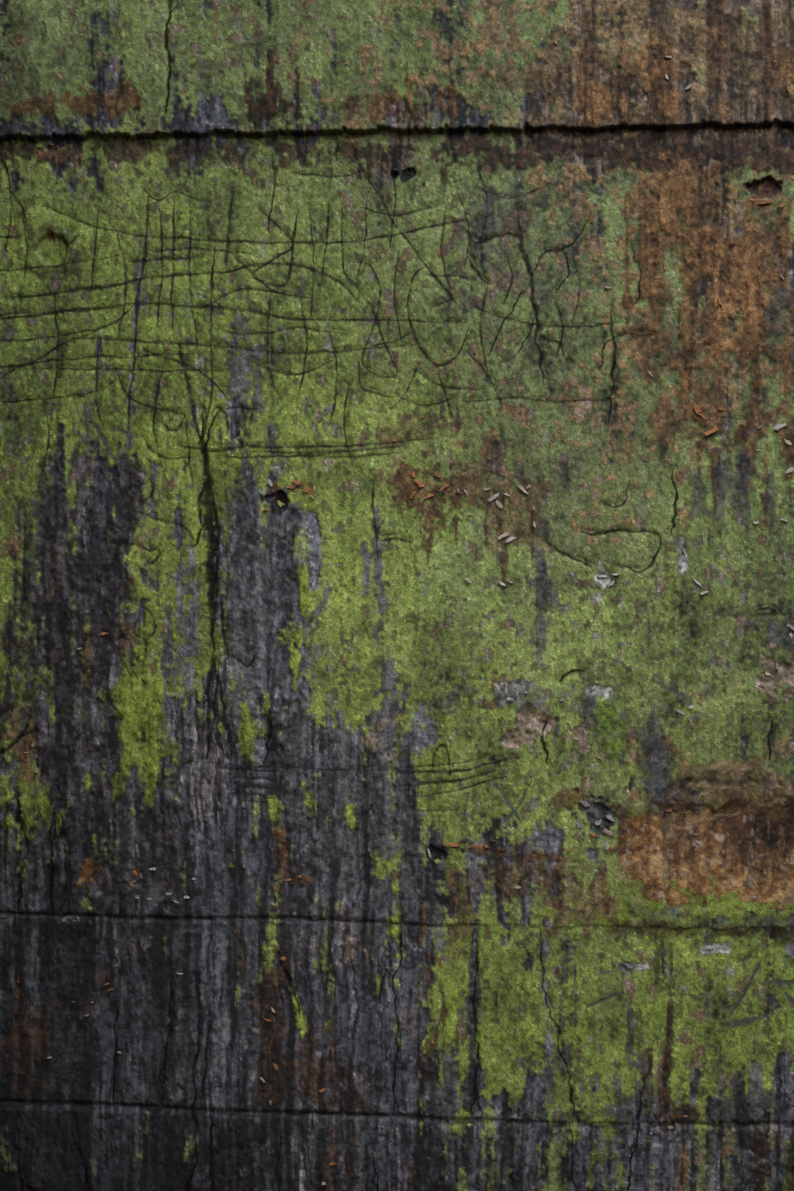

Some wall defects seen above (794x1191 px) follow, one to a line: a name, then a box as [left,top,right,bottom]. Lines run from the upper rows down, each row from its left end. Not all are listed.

rust [243,48,301,126]
rust [0,135,250,178]
rust [265,140,416,175]
rust [341,0,794,541]
spalling [260,479,314,516]
spalling [77,858,102,890]
spalling [114,857,196,911]
rust [449,725,794,1132]